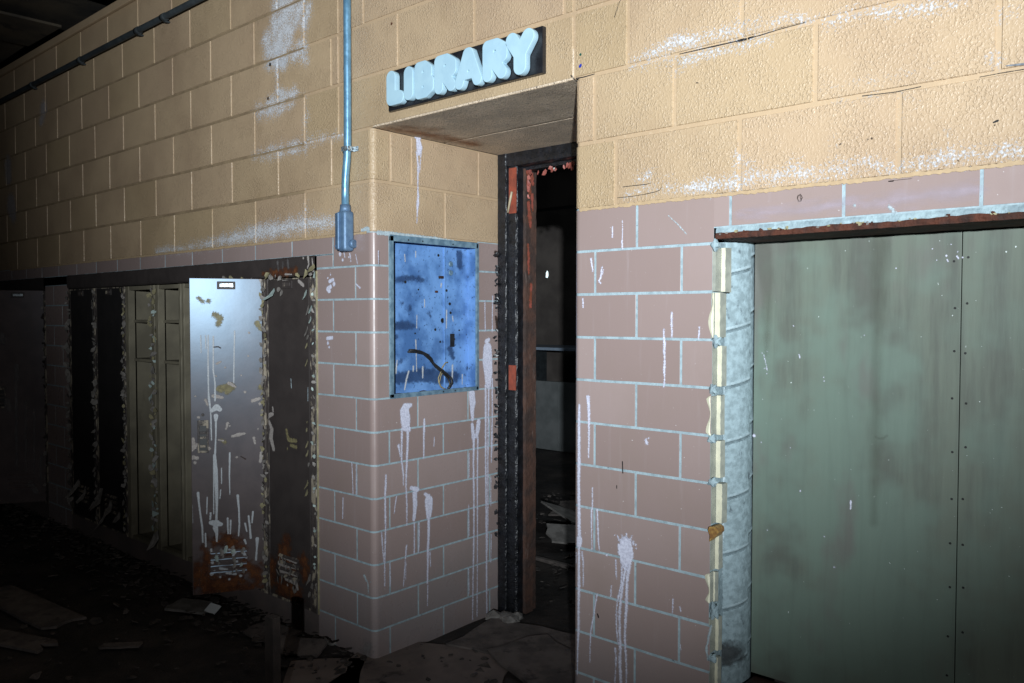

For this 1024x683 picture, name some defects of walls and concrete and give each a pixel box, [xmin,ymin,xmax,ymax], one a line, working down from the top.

efflorescence [255,0,313,123]
crack [680,22,805,54]
water stain [629,0,966,78]
peeling [527,161,575,199]
efflorescence [666,134,1024,194]
efflorescence [157,205,335,256]
corrosion [193,532,309,602]